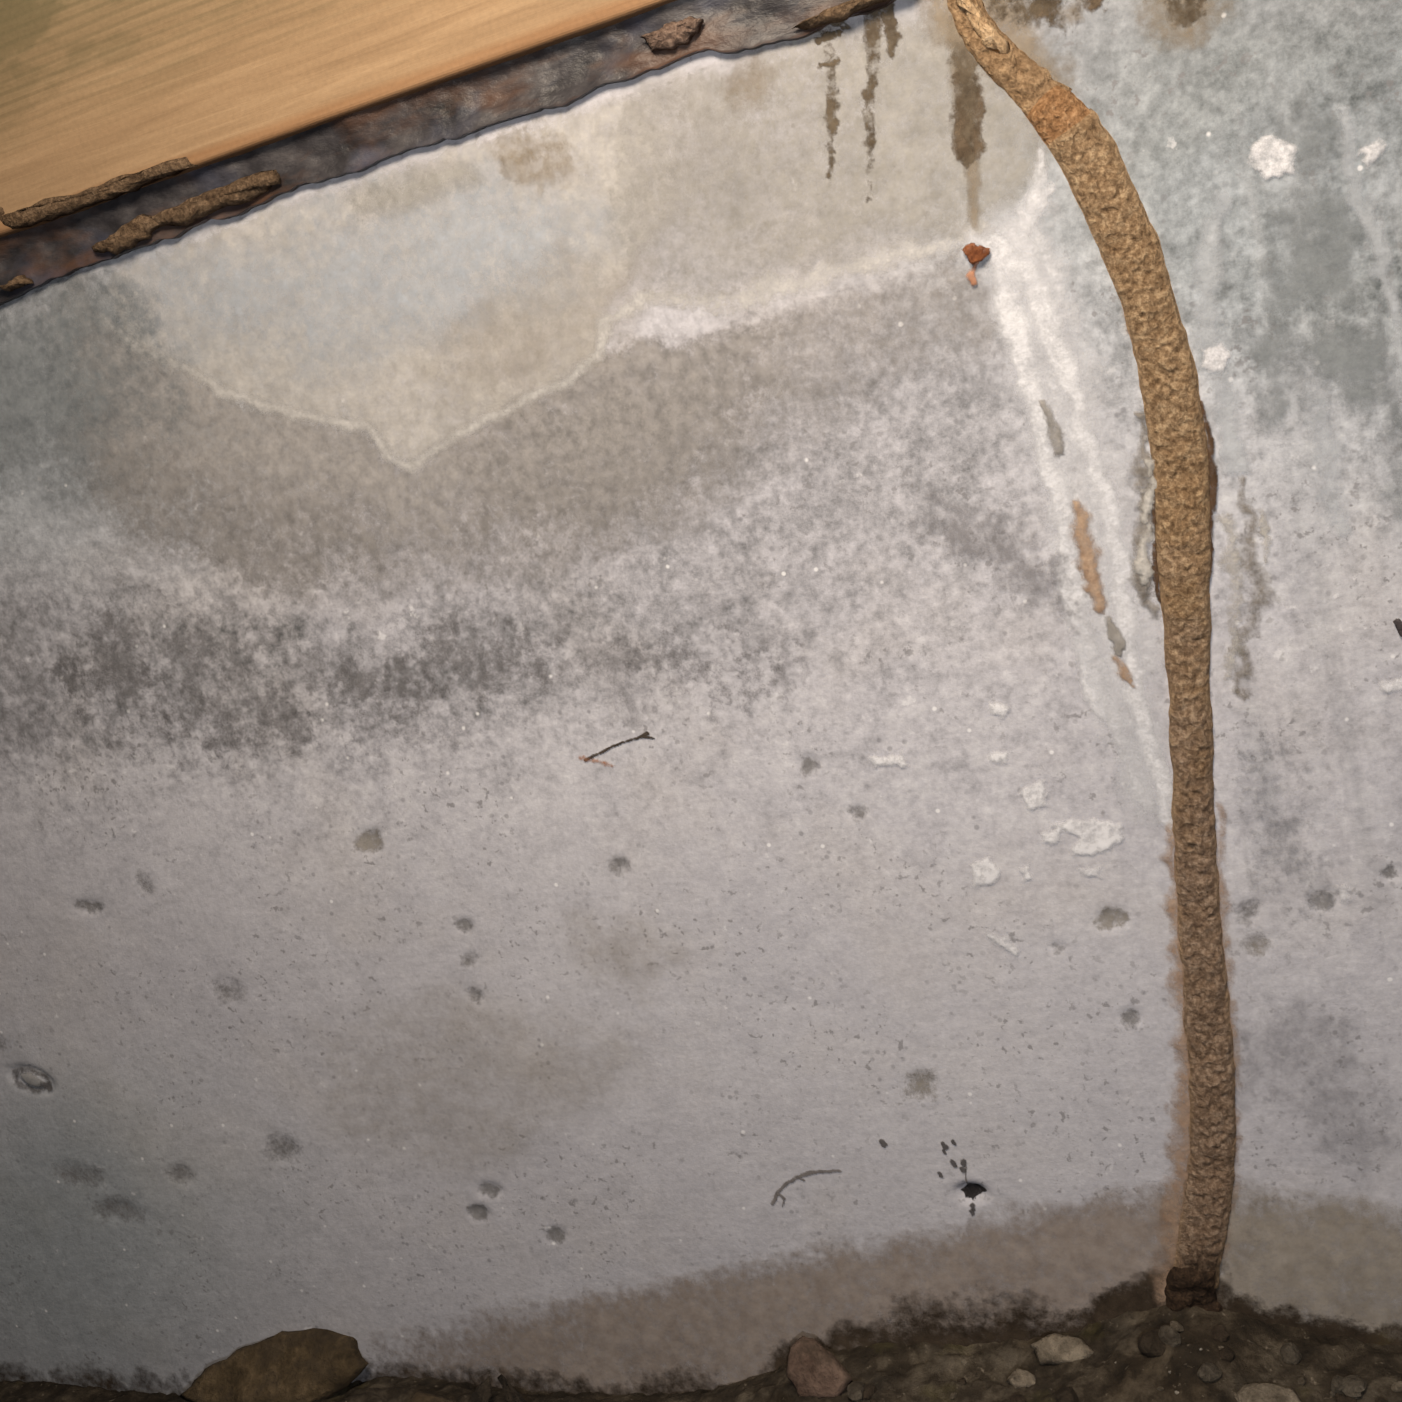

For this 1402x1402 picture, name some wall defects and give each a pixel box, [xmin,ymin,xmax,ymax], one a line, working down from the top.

water stain [1152,0,1213,41]
corrosion [962,243,990,285]
water stain [1264,106,1402,407]
water stain [0,0,1173,830]
water stain [406,1193,1182,1395]
water stain [1219,1188,1402,1345]